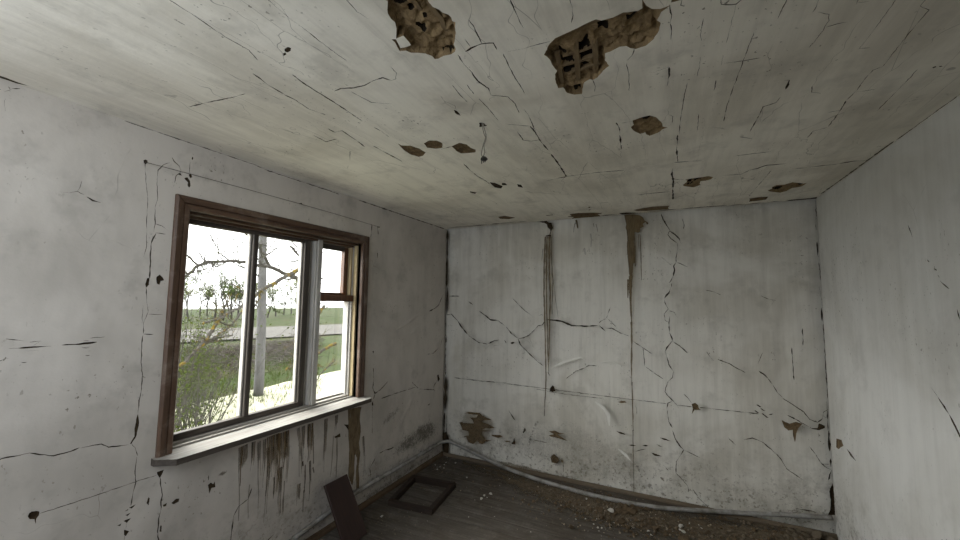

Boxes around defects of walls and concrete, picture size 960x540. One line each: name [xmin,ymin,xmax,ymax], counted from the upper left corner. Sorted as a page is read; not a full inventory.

flaking render [386,0,456,59]
flaking render [544,0,683,95]
flaking render [399,140,476,157]
flaking render [624,115,673,136]
crack [359,0,960,515]
crack [0,121,338,540]
damp [542,237,558,416]
damp [624,214,648,488]
damp [265,430,290,515]
damp [299,407,365,498]
flaking render [459,412,526,444]
flaking render [782,415,825,441]